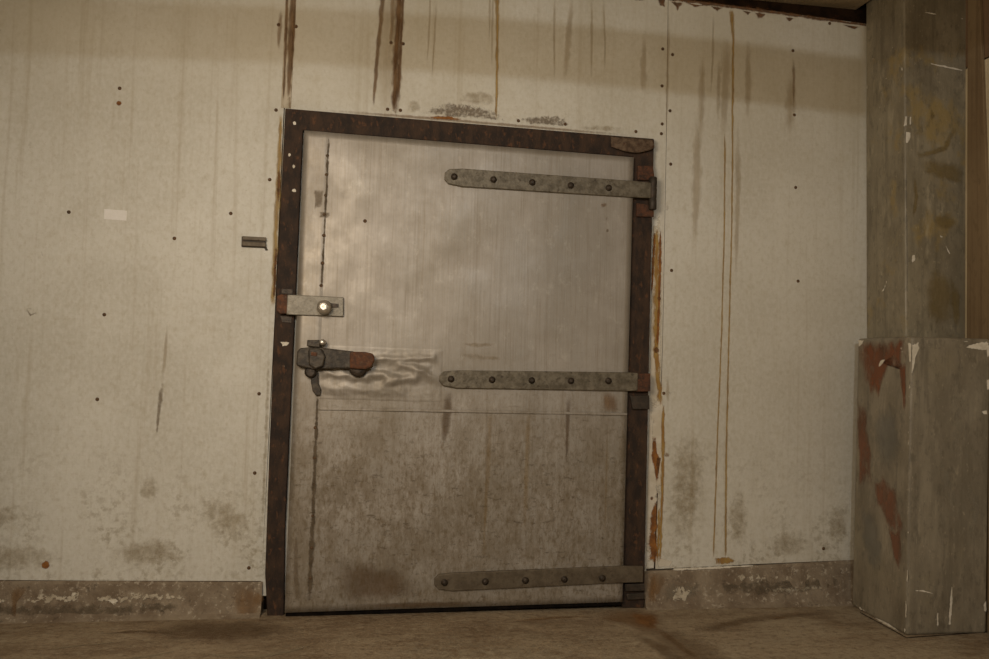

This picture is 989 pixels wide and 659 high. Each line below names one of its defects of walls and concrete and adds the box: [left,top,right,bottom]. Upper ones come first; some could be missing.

corrosion [283,0,296,96]
corrosion [373,0,384,100]
corrosion [392,0,404,107]
corrosion [271,121,282,301]
corrosion [315,139,330,283]
corrosion [649,232,665,561]
corrosion [659,0,866,564]
peeling [964,341,989,357]
corrosion [308,400,318,593]